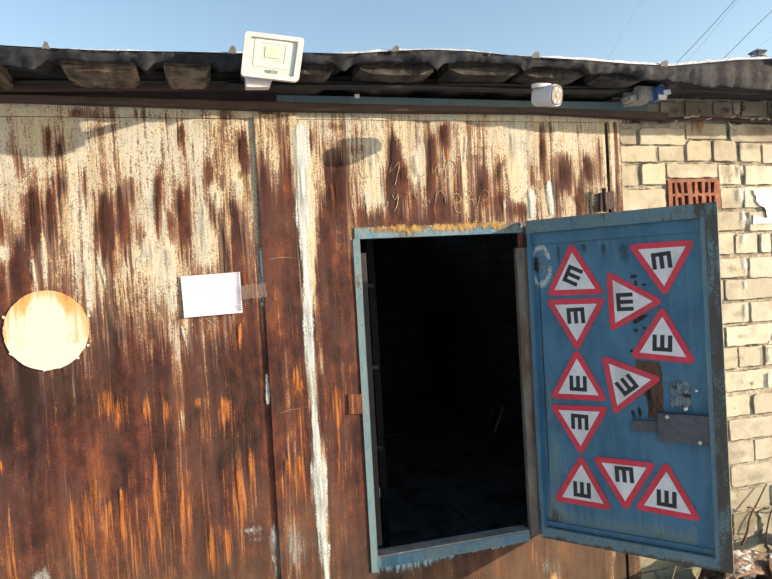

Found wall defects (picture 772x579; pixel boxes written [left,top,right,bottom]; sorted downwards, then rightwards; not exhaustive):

rust [27,190,37,247]
rust [100,192,111,240]
rust [153,177,185,226]
rust [330,164,346,213]
rust [382,138,407,195]
rust [371,221,507,235]
rust [236,449,254,510]